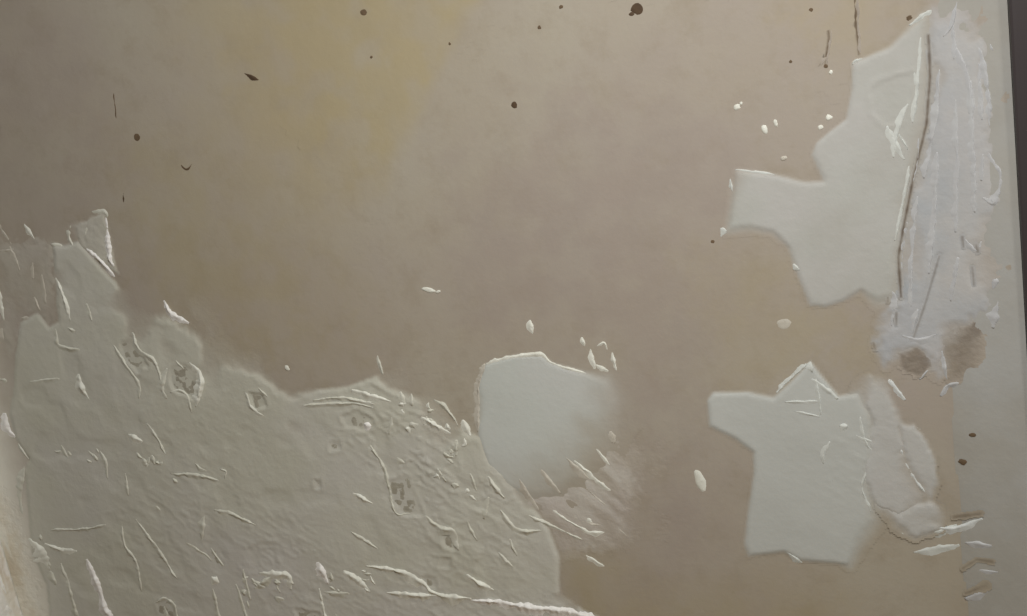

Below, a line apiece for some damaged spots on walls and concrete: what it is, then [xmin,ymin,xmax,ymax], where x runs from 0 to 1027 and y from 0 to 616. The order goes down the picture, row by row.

crack [817,0,861,69]
peeling [66,210,122,277]